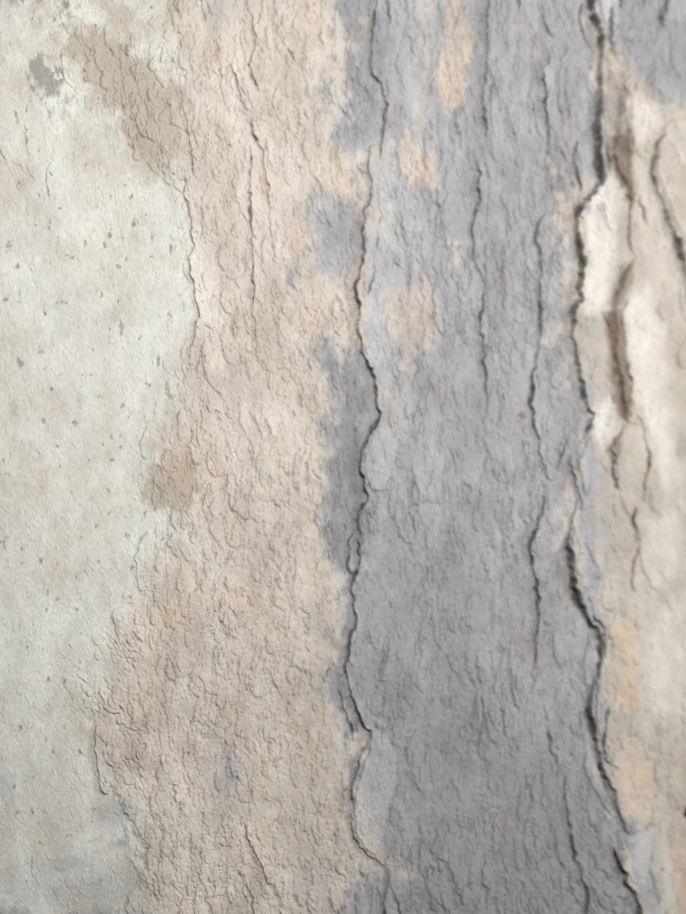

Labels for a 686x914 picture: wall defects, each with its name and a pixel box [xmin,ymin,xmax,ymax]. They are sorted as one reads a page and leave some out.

crack [578,0,669,72]
crack [338,0,401,914]
crack [527,117,686,914]
peeling [616,431,645,519]
crack [478,691,508,750]
peeling [584,643,616,759]
peeling [584,751,615,818]
peeling [622,840,645,884]